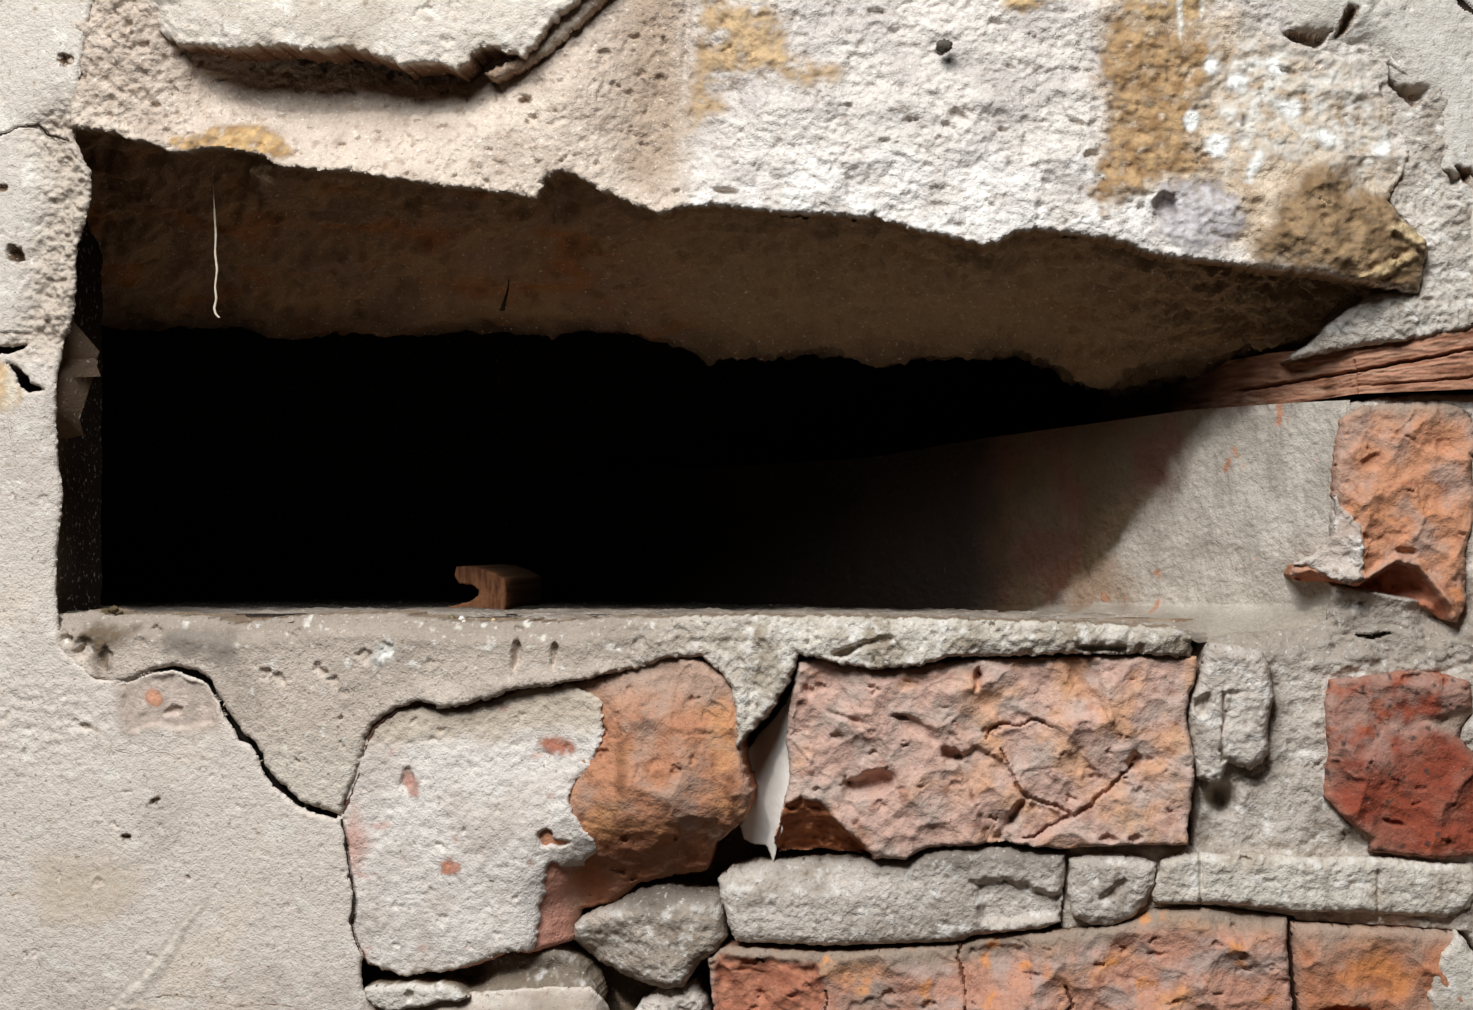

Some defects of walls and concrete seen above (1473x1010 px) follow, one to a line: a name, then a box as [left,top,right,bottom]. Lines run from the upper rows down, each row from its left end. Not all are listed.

crack [0,124,66,141]
peeling [1358,222,1426,282]
crack [0,346,42,458]
peeling [370,638,395,665]
crack [157,666,515,954]
spalling [713,955,826,1010]